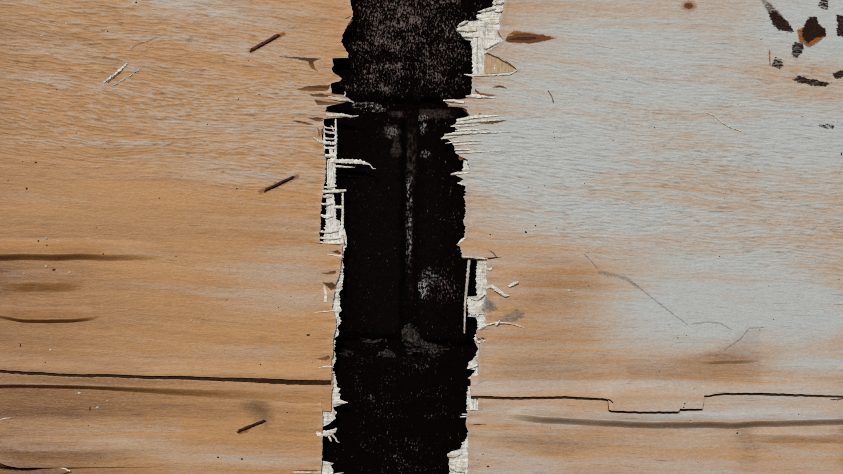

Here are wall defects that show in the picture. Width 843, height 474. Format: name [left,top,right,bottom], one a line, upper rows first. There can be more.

spalling [484,53,517,74]
spalling [297,85,340,105]
peeling [351,101,387,113]
peeling [361,323,450,358]
crack [0,352,331,411]
crack [471,376,843,414]